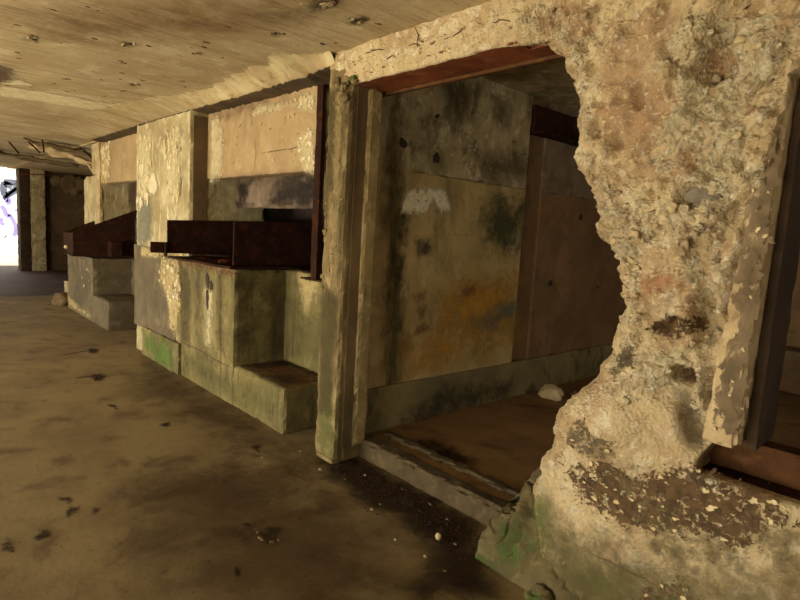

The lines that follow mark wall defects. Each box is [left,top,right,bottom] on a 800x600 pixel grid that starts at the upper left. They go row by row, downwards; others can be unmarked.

peeling [136,125,181,234]
leakage [236,179,252,208]
leakage [269,175,314,211]
leakage [483,195,525,254]
spalling [508,0,793,444]
peeling [141,247,183,337]
peeling [558,413,800,563]